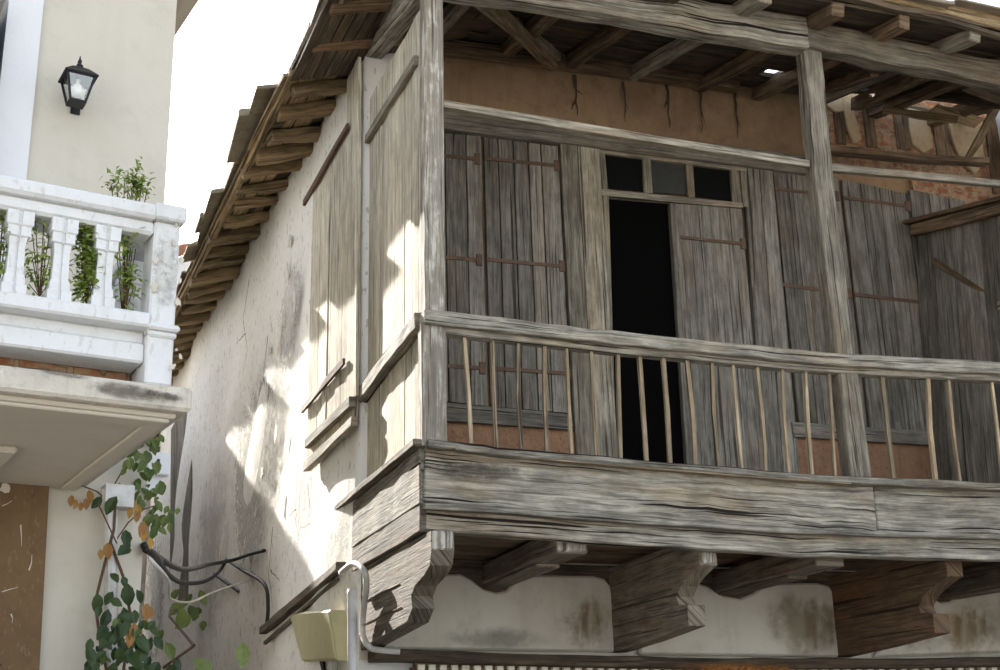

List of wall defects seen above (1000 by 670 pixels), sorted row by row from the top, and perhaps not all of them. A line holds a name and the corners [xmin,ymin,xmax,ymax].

crack [571,74,582,116]
crack [621,81,629,122]
crack [663,85,671,127]
crack [698,92,706,132]
crack [733,93,741,138]